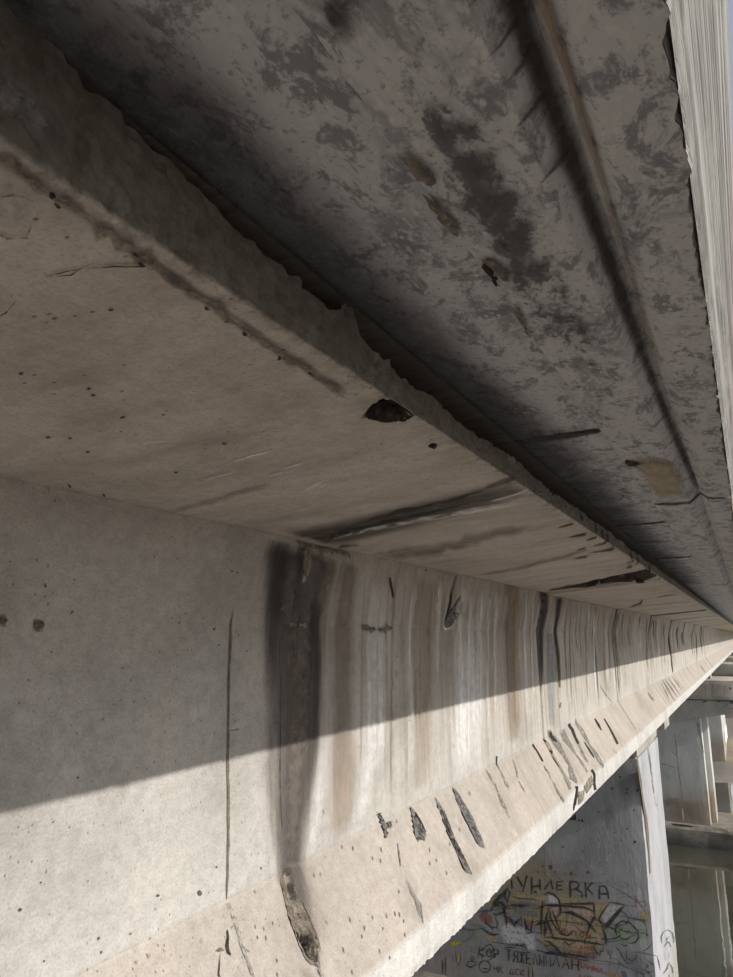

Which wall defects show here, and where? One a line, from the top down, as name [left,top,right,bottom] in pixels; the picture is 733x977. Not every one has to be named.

water stain [2,0,689,580]
water stain [494,0,725,505]
spalling [362,398,414,423]
water stain [337,567,354,731]
crack [216,610,254,977]
crack [273,708,281,810]
water stain [271,546,333,917]
spalling [410,807,437,865]
spalling [435,788,485,874]
water stain [456,657,480,755]
spalling [532,719,604,832]
spalling [281,871,324,977]